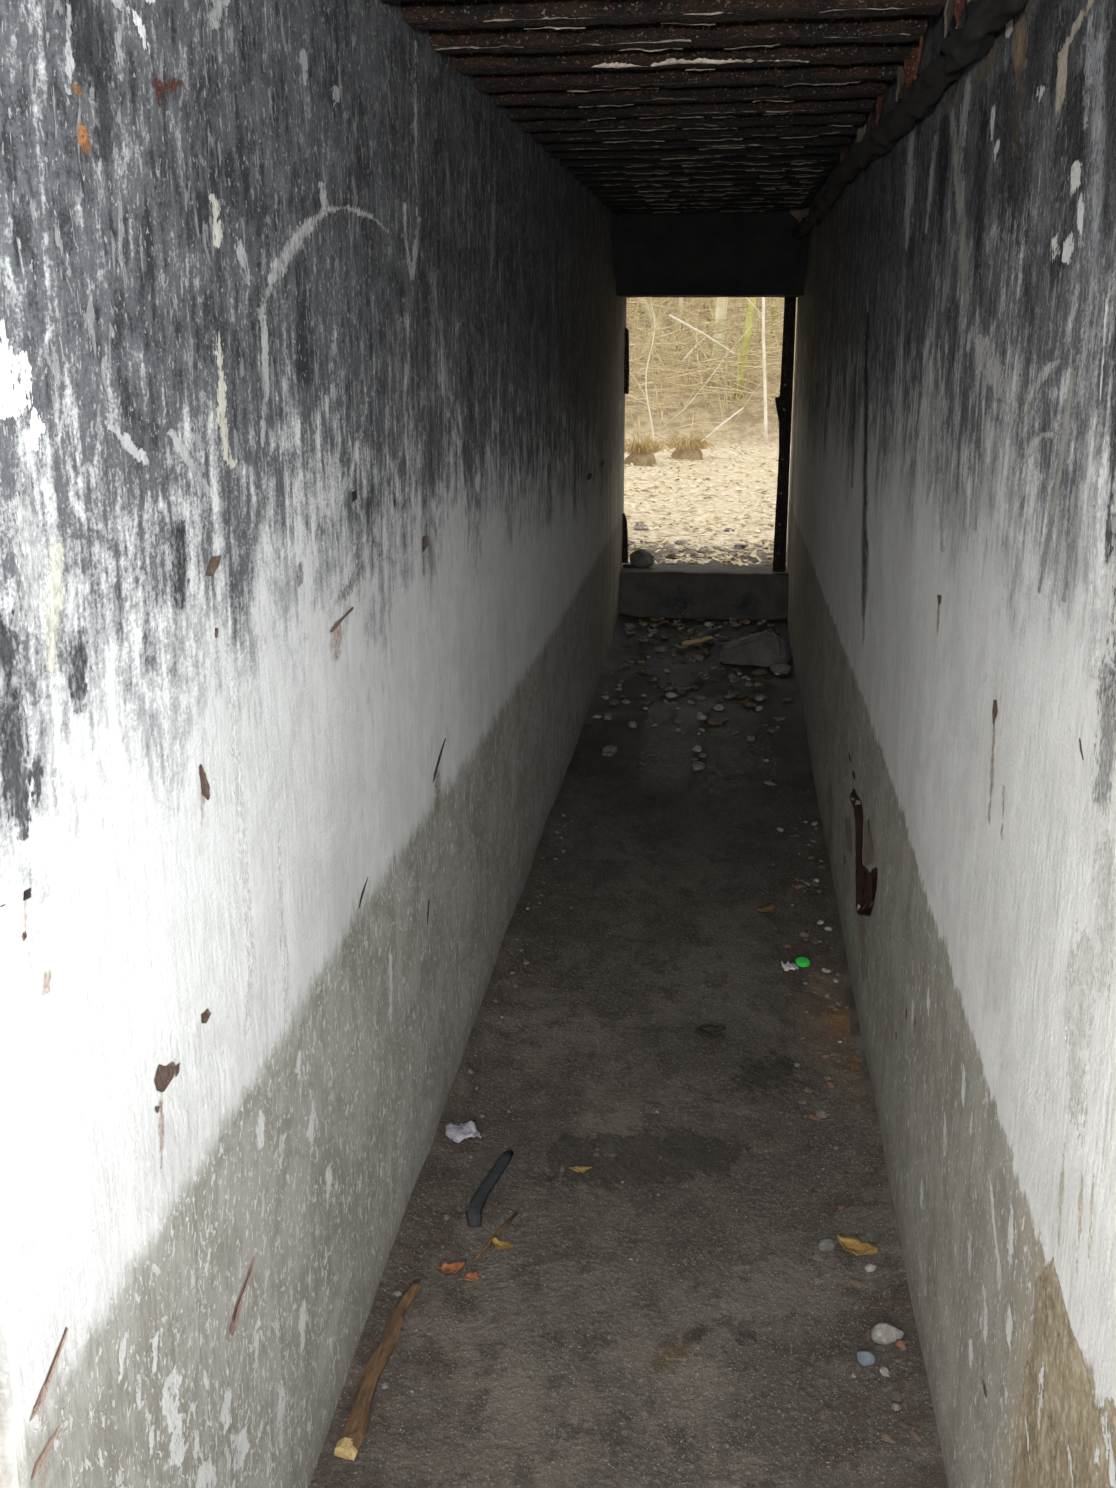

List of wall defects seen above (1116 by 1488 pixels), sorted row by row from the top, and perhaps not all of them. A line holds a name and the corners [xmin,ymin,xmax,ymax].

water stain [89,74,117,165]
rust [840,0,971,163]
water stain [936,75,990,316]
rust [1005,13,1030,159]
peeling [0,319,46,452]
water stain [851,311,870,643]
water stain [974,334,1016,529]
water stain [1055,0,1116,815]
peeling [1,492,65,675]
water stain [172,520,191,609]
water stain [67,626,93,713]
water stain [29,758,44,807]